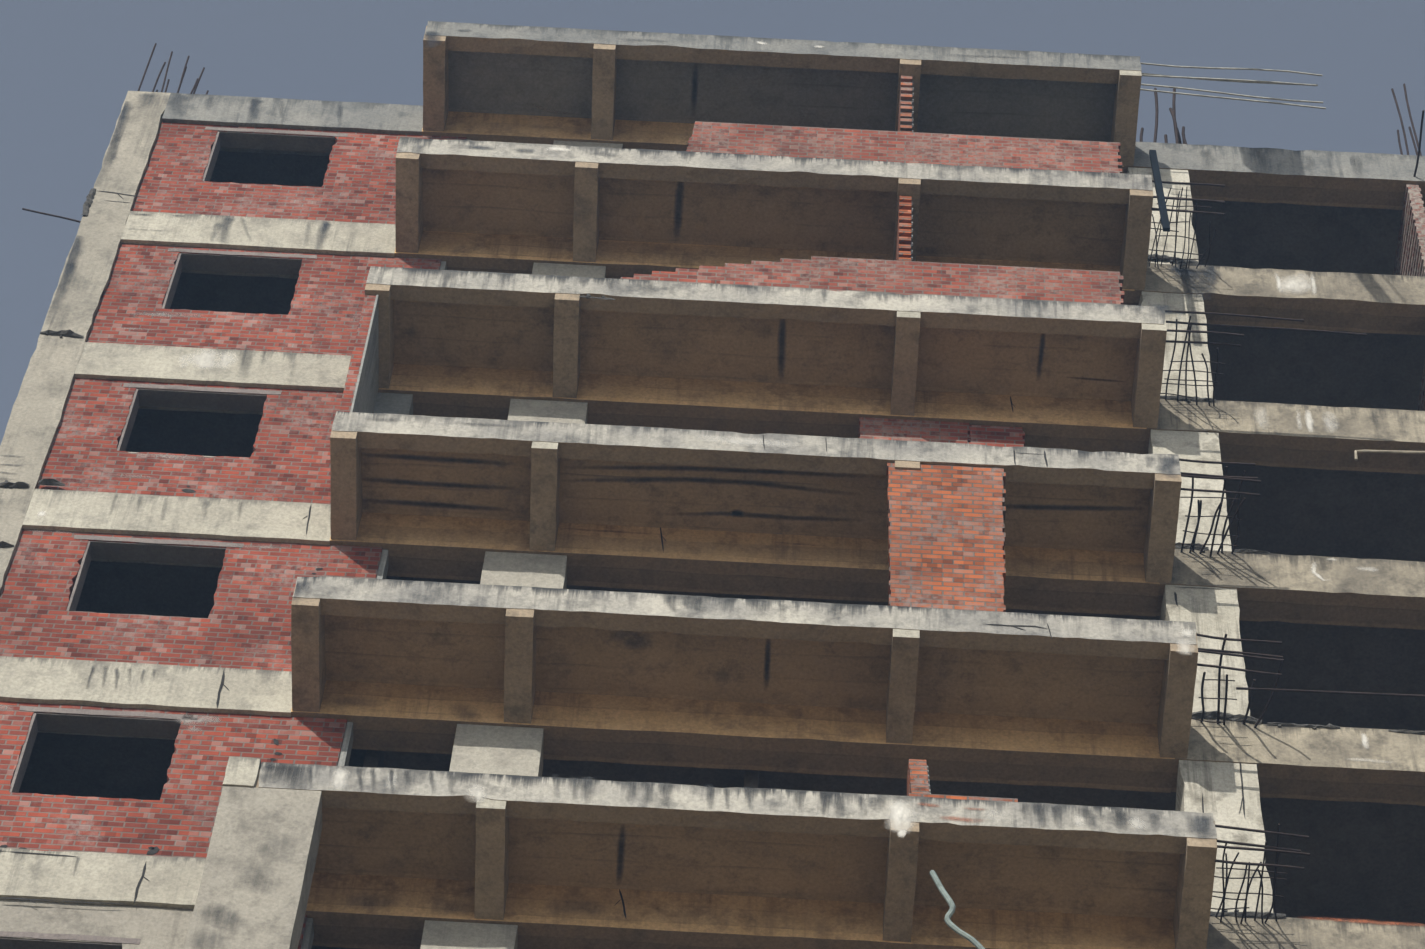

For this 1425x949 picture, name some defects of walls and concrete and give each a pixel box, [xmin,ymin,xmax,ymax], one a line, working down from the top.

crack [216,671,229,708]
water stain [335,769,408,784]
water stain [892,803,909,836]
crack [0,862,149,904]
crack [614,889,626,918]